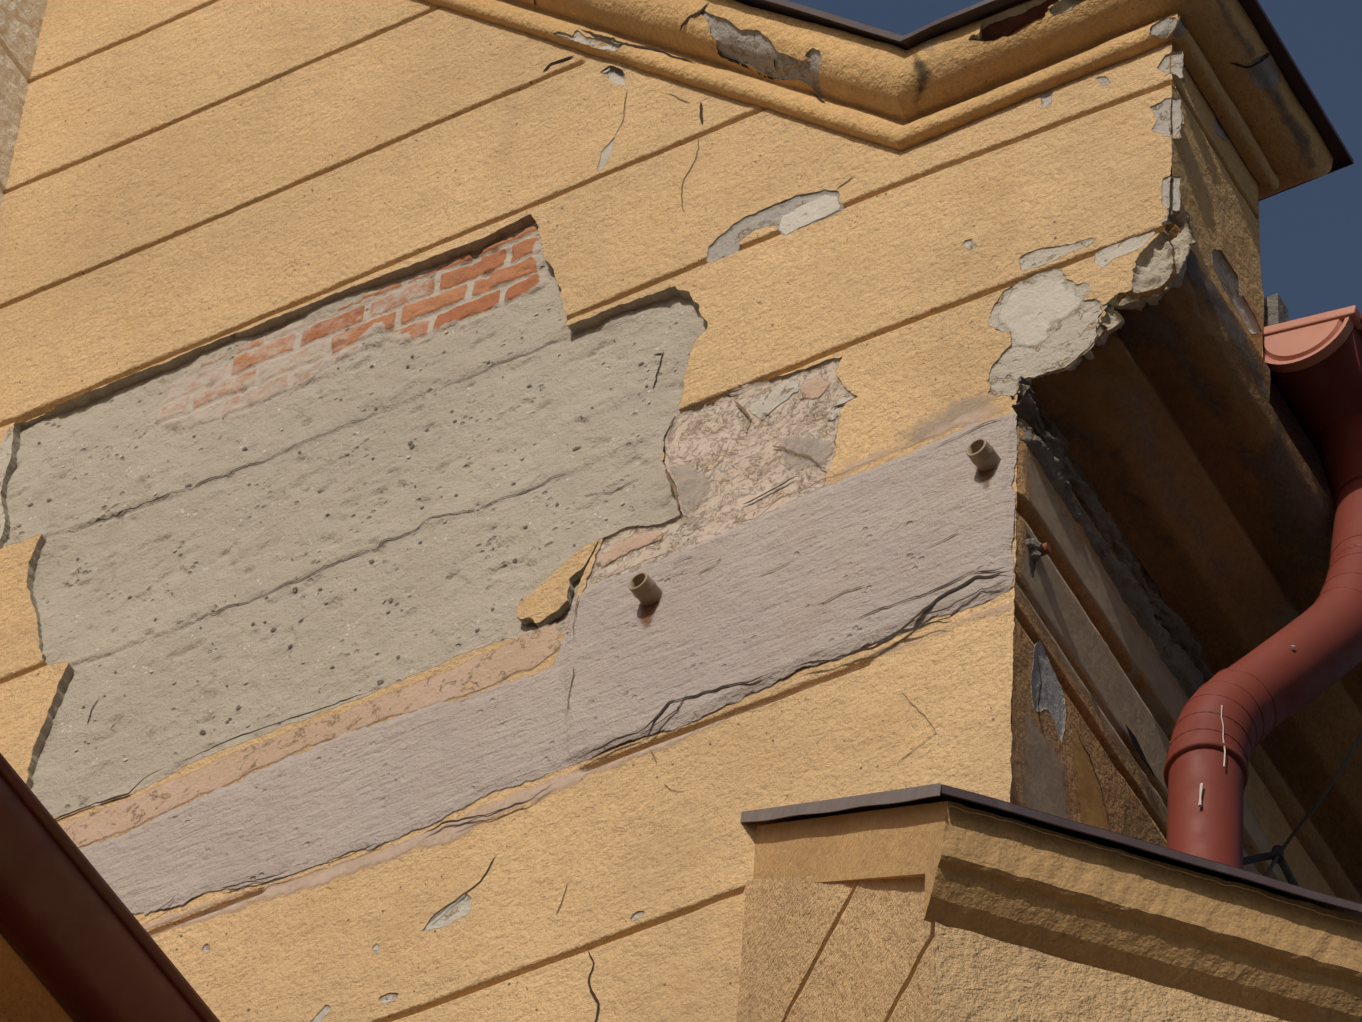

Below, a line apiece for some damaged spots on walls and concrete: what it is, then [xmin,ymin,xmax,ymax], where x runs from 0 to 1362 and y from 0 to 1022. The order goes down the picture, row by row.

crack [543,3,776,80]
peeling [687,11,824,98]
spalling [968,0,1085,41]
peeling [1149,15,1187,140]
crack [671,94,703,211]
peeling [707,189,845,263]
water stain [1185,252,1266,393]
peeling [987,176,1204,699]
spalling [0,214,858,847]
water stain [1246,436,1334,571]
peeling [1031,640,1066,743]
crack [588,951,600,1022]